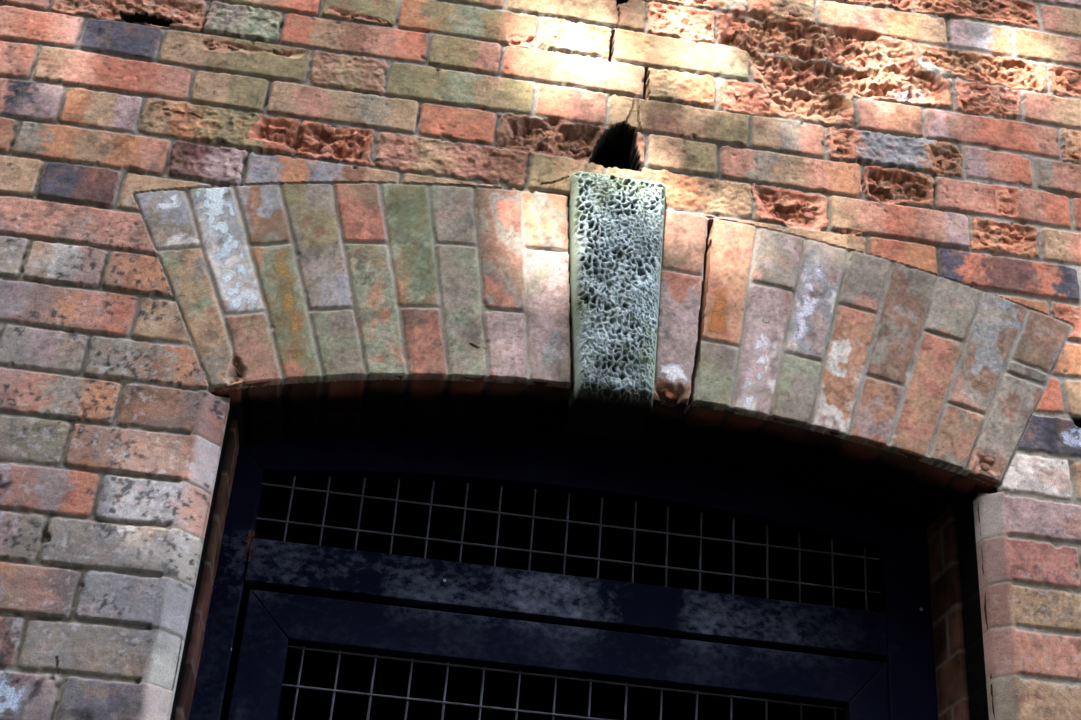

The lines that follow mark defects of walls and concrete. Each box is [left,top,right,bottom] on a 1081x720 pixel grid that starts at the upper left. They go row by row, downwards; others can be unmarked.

spalling [52,0,308,60]
crack [608,4,621,62]
crack [624,66,651,134]
spalling [642,0,1081,164]
spalling [246,114,375,167]
spalling [495,113,607,162]
spalling [861,143,963,205]
spalling [751,183,863,237]
spalling [969,187,1038,249]
crack [684,219,714,414]